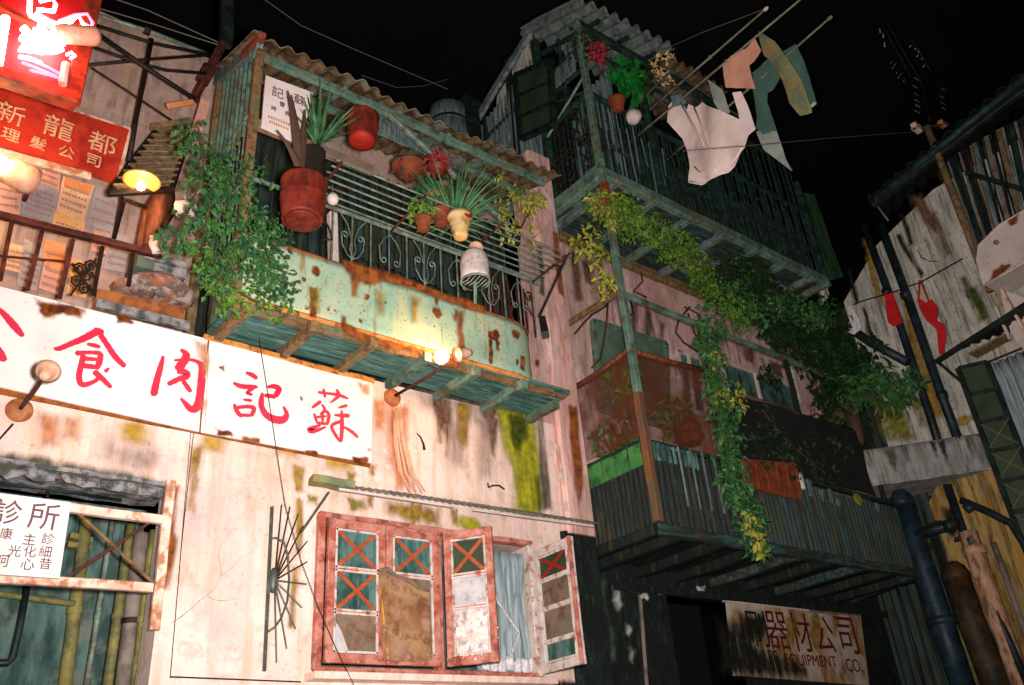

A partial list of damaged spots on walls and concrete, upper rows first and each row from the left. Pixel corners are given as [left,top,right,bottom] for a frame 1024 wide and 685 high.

corrosion [198,343,224,372]
corrosion [241,240,539,381]
leakage [433,396,551,516]